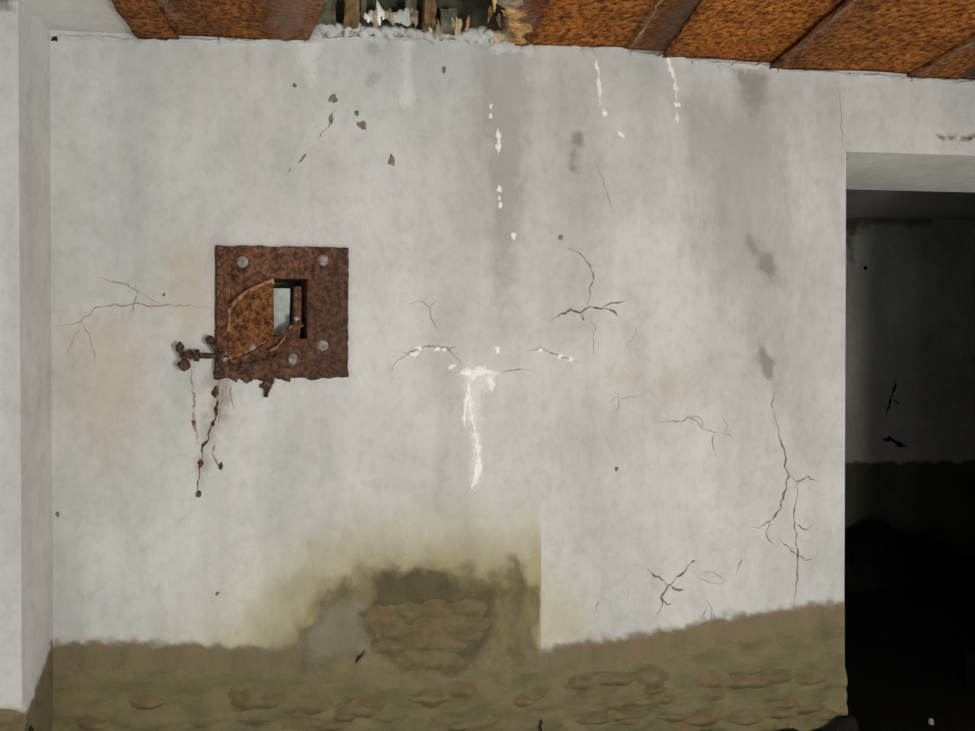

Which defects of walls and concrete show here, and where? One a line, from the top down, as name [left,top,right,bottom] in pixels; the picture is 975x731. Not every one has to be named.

peeling [429,16,470,41]
peeling [488,0,532,44]
water stain [846,218,929,248]
crack [54,277,210,355]
crack [393,301,462,369]
crack [495,248,637,372]
rust [190,370,234,498]
efflorescence [456,365,502,493]
crack [754,393,819,602]
crack [647,559,742,620]
water stain [0,549,848,731]